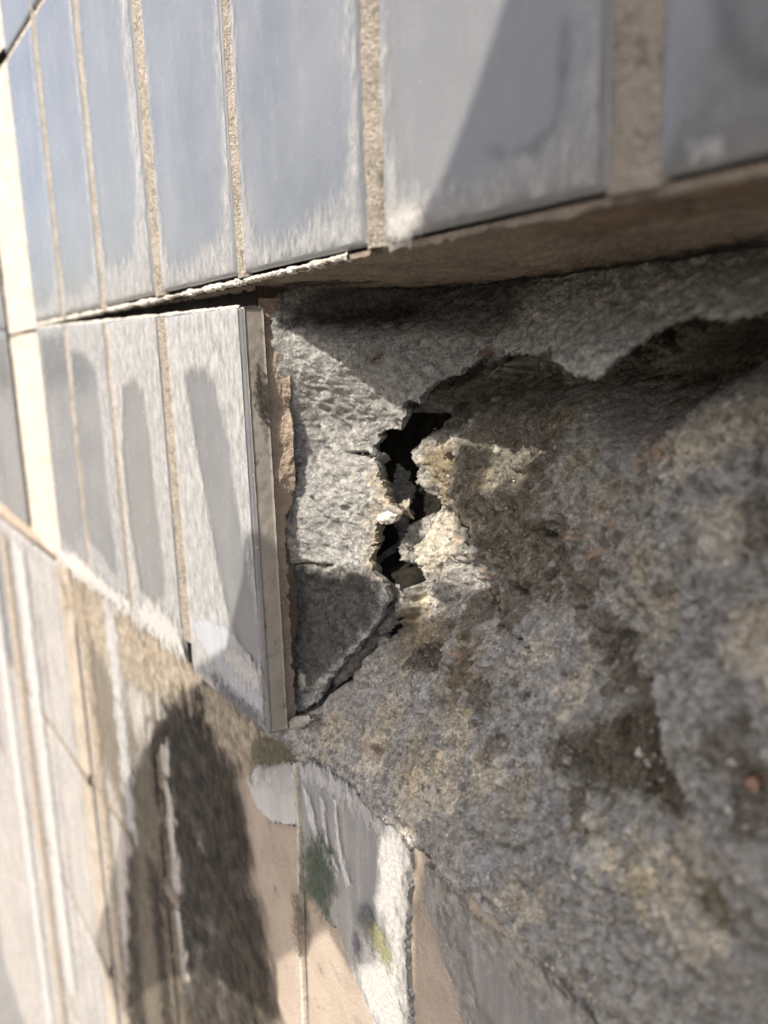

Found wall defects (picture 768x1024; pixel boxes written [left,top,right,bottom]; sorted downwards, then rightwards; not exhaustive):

crack [294,561,333,569]
crack [305,617,405,714]
crack [356,412,471,592]
spalling [246,246,768,1024]